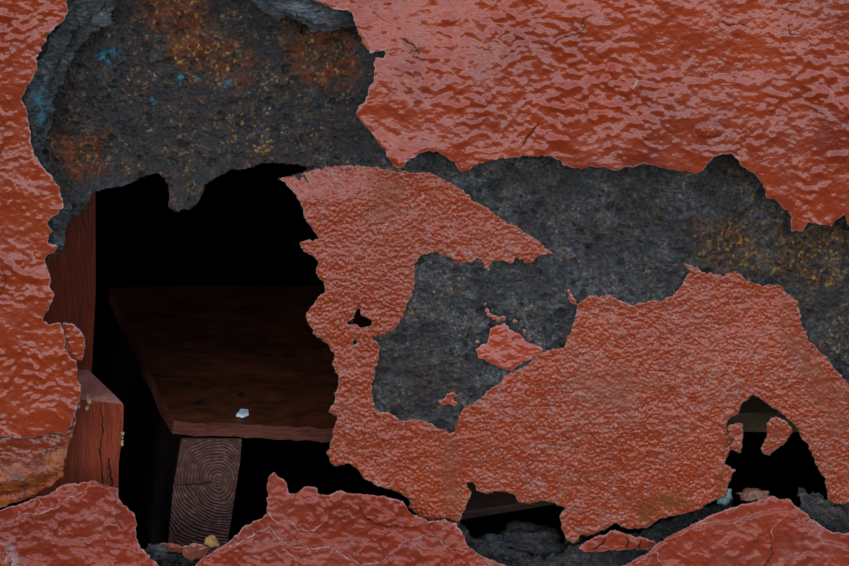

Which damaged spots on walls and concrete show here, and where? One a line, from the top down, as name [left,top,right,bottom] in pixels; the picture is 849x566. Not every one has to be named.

spalling [251,0,356,34]
spalling [21,0,115,262]
corrosion [42,0,849,433]
peeling [484,302,517,323]
peeling [438,392,458,407]
peeling [727,422,744,453]
peeling [760,416,793,456]
corrosion [797,487,849,534]